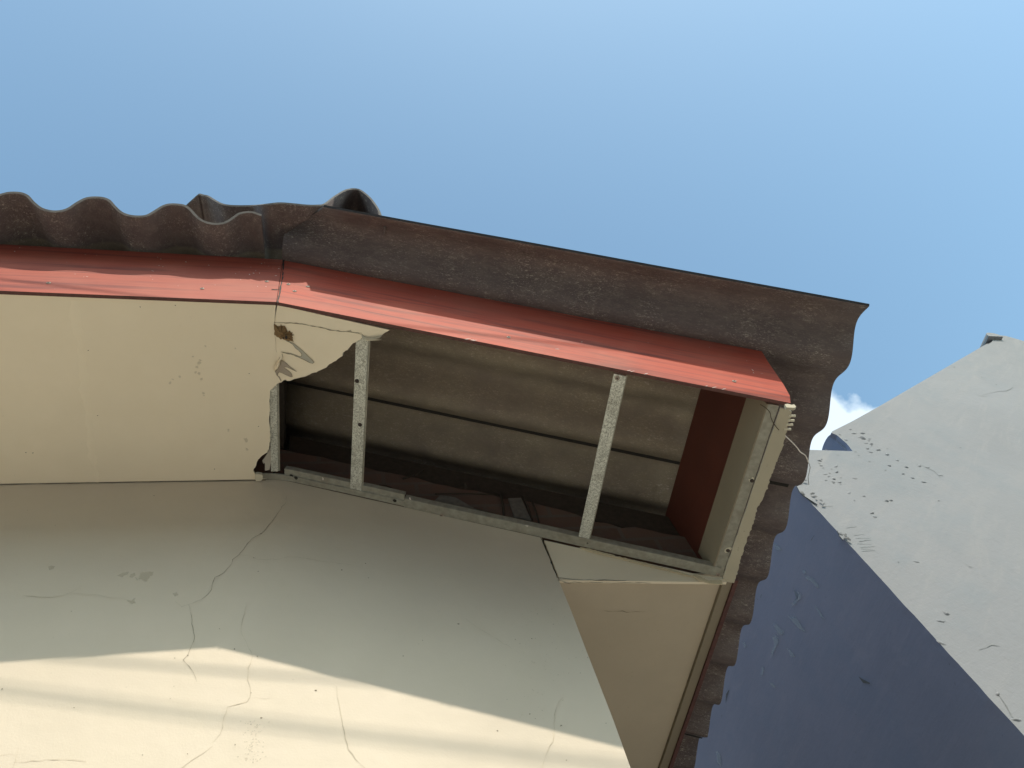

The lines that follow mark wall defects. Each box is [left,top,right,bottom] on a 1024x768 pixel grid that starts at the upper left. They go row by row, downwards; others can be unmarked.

flaking render [255,448,271,481]